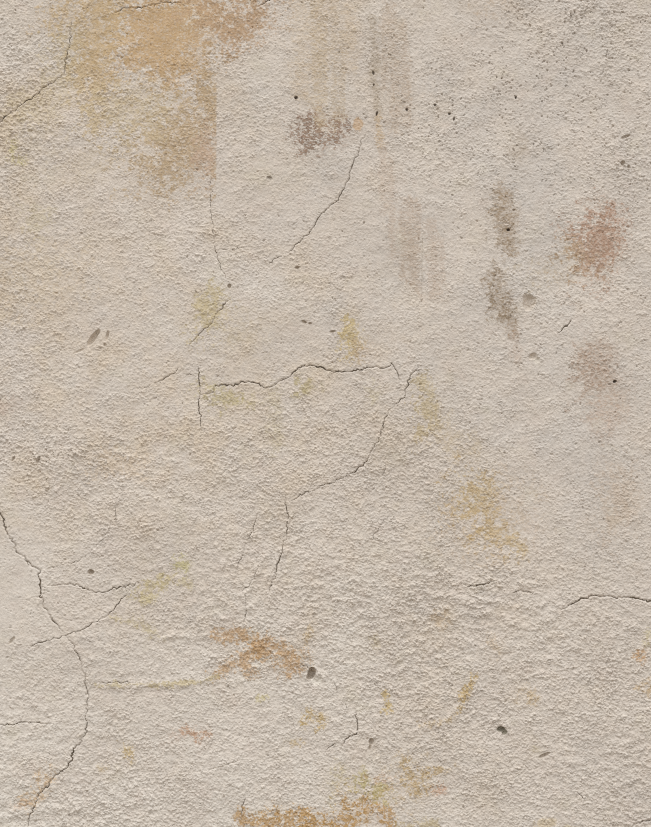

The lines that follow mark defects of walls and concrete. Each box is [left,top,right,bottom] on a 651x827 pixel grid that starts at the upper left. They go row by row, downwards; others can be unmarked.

crack [2,35,71,121]
water stain [431,0,528,41]
water stain [0,0,451,342]
crack [270,152,359,263]
water stain [471,111,536,370]
crack [163,363,421,616]
crack [0,513,136,826]
corrosion [90,620,319,705]
corrosion [224,668,485,827]
crack [563,595,651,609]